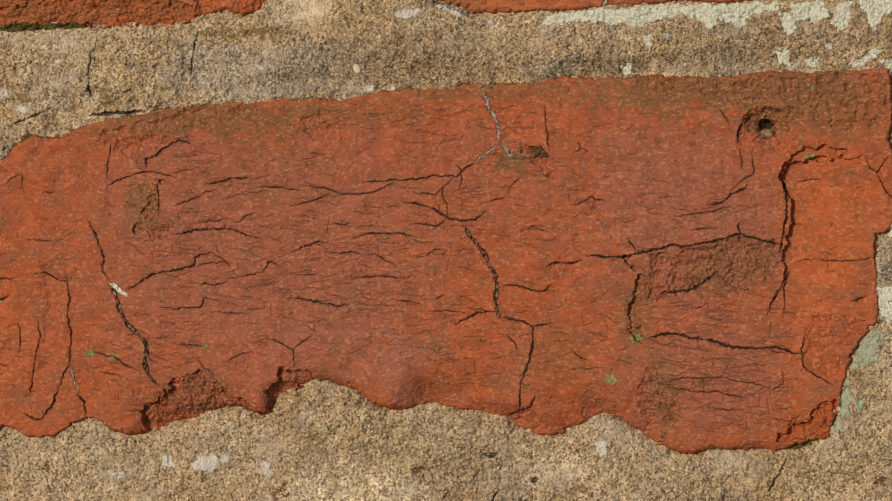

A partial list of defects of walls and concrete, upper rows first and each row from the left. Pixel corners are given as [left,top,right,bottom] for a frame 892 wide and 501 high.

damp [542,0,892,36]
crack [87,86,830,415]
spalling [627,236,780,345]
crack [769,258,869,311]
crack [1,272,86,420]